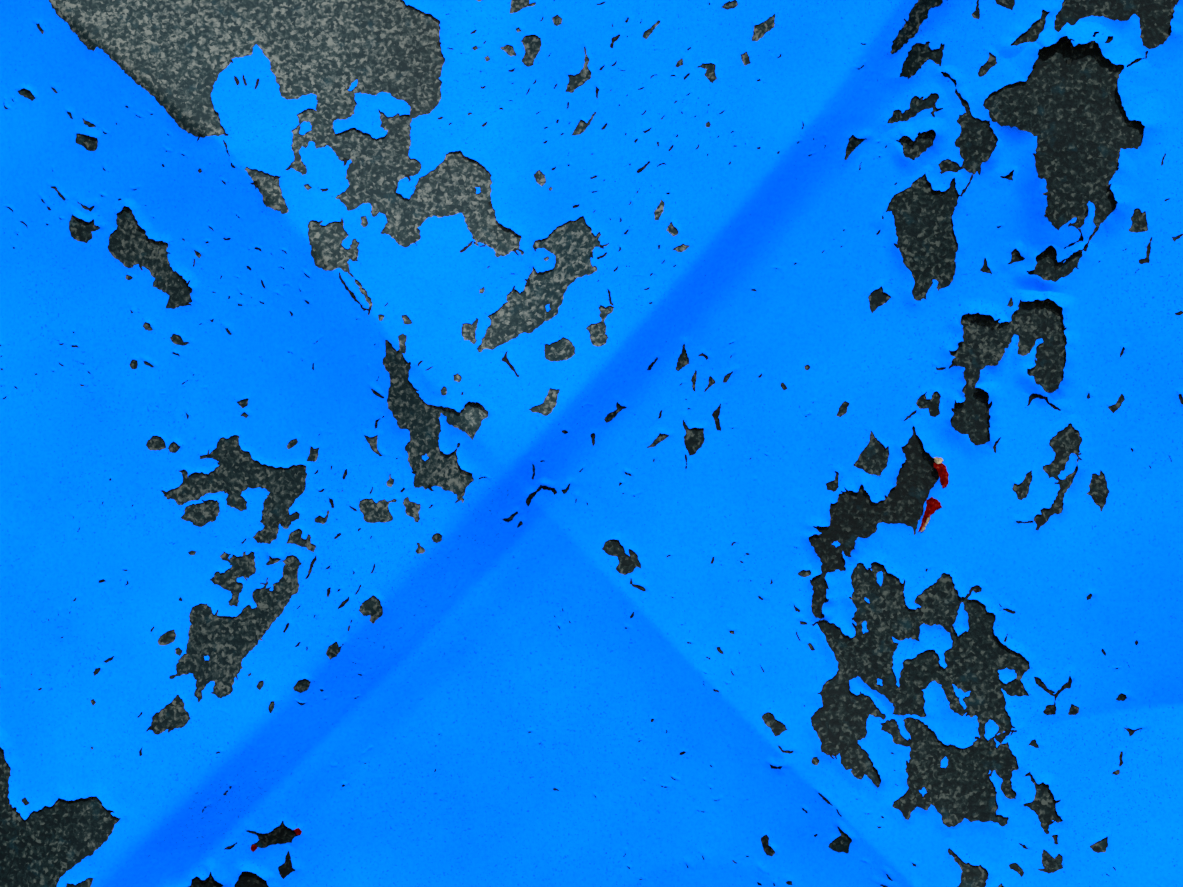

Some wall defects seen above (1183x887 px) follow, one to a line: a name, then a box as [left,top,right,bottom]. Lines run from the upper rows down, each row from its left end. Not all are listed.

peeling [49,0,609,352]
peeling [882,0,1175,301]
peeling [359,315,488,523]
peeling [916,297,1067,445]
peeling [146,435,329,735]
peeling [798,426,1063,874]
peeling [0,747,121,887]
peeling [188,871,269,887]
peeling [247,821,302,879]
peeling [948,848,1004,887]
peeling [1009,863,1024,877]